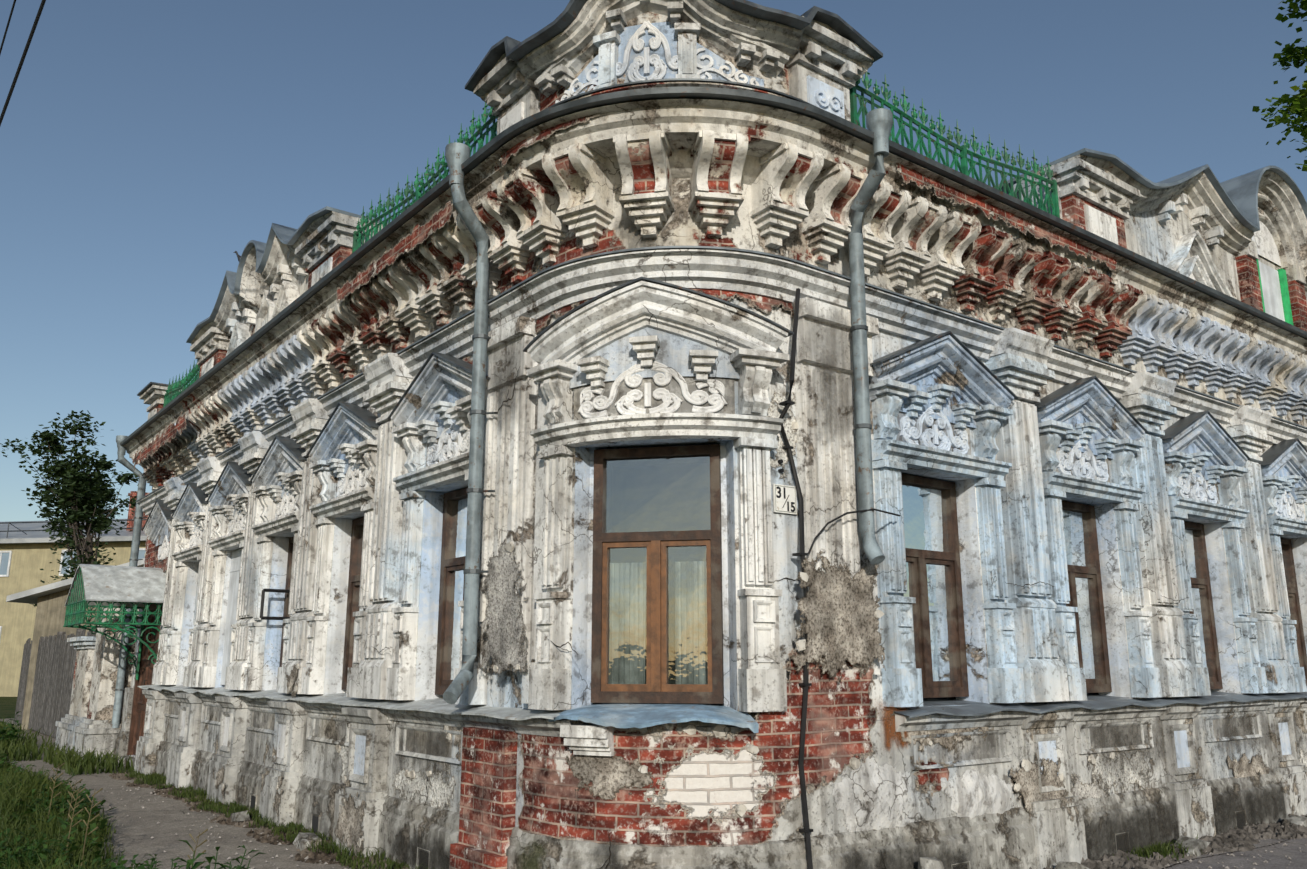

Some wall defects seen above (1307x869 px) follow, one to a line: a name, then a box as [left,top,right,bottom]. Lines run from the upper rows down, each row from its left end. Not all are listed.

flaking render [336,201,453,303]
flaking render [495,227,628,294]
flaking render [896,163,1117,271]
flaking render [689,288,794,319]
spalling [475,400,538,681]
flaking render [517,551,895,847]
peeling [392,725,463,809]
spalling [901,727,994,797]
water stain [602,843,619,869]
water stain [845,846,969,869]
water stain [1084,801,1179,860]
water stain [1212,785,1286,831]